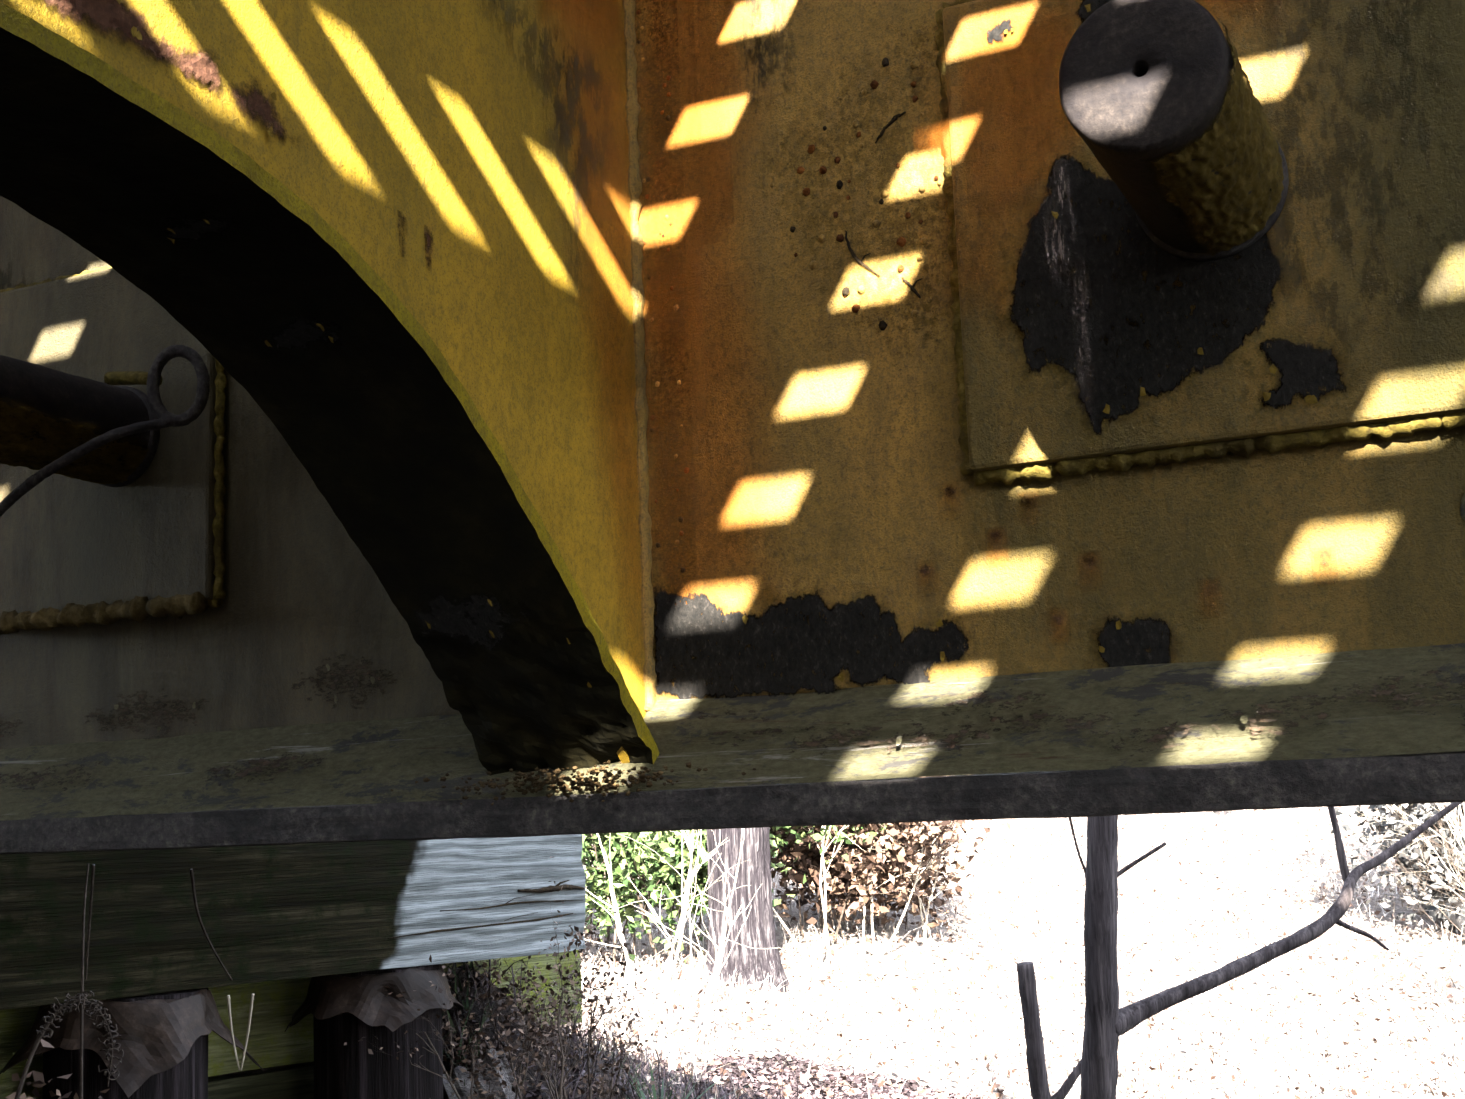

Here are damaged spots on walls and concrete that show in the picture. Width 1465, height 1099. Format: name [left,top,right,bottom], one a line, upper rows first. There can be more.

peeling [1076,0,1110,23]
corrosion [44,0,298,141]
peeling [1010,23,1347,435]
peeling [654,587,969,699]
peeling [1097,616,1172,667]